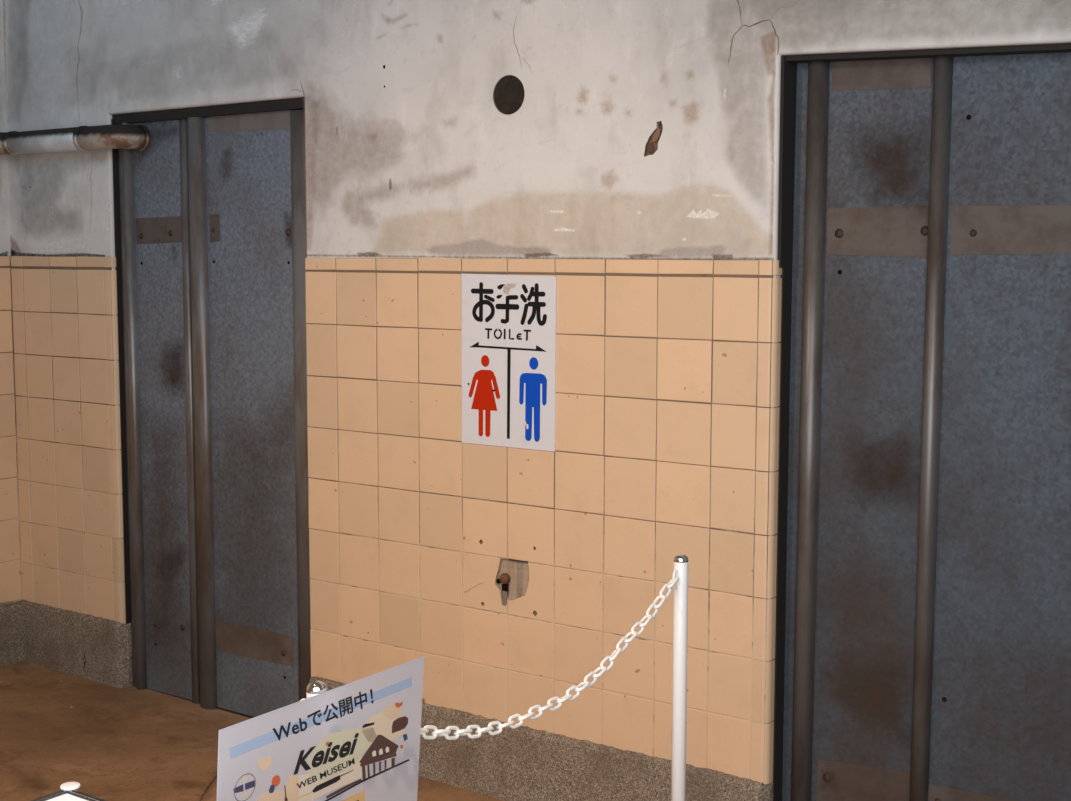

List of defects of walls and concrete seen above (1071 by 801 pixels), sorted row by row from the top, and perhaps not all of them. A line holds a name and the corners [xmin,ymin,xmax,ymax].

crack [728,0,796,62]
flaking render [644,121,663,157]
spalling [495,558,529,606]
crack [200,775,217,801]